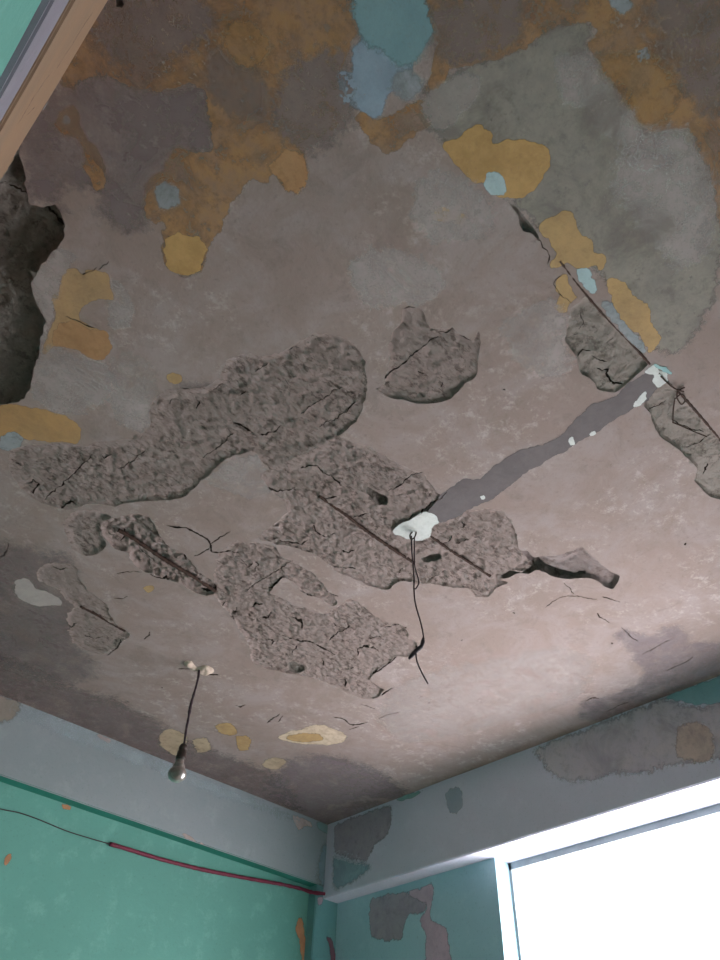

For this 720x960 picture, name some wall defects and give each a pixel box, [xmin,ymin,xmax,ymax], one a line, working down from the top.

leakage [19,76,212,234]
peeling [442,124,661,393]
flaking render [0,148,620,699]
flaking render [644,383,720,499]
crack [166,525,239,556]
flaking render [334,790,423,861]
flaking render [369,884,451,960]